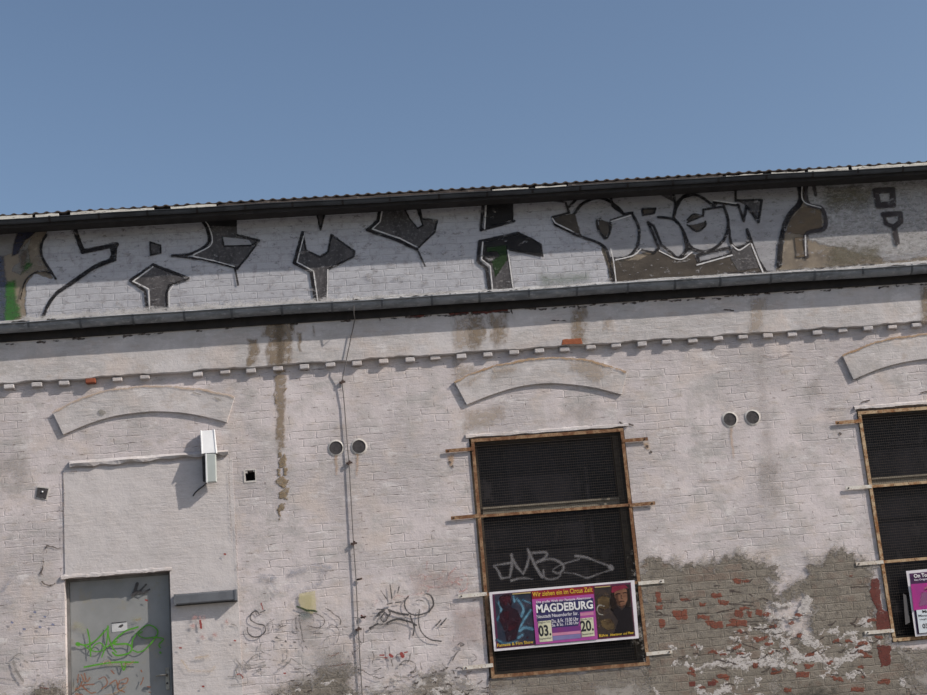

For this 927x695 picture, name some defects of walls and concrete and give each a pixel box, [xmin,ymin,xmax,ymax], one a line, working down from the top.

damp [457,314,506,347]
damp [247,323,301,520]
spalling [31,680,68,695]
spalling [274,545,927,695]